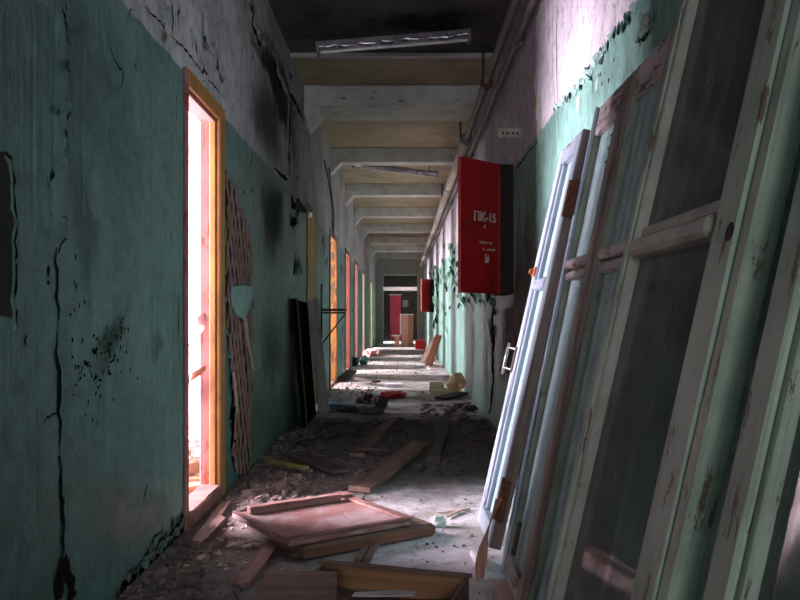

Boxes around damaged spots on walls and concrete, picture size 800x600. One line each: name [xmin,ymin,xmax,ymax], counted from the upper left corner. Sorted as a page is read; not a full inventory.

crack [129,2,225,107]
leakage [251,41,295,148]
crack [274,95,297,181]
peeling [553,2,654,111]
crack [43,215,77,600]
leakage [72,317,138,425]
spalling [225,169,255,477]
crack [486,306,495,413]
spalling [117,507,186,597]